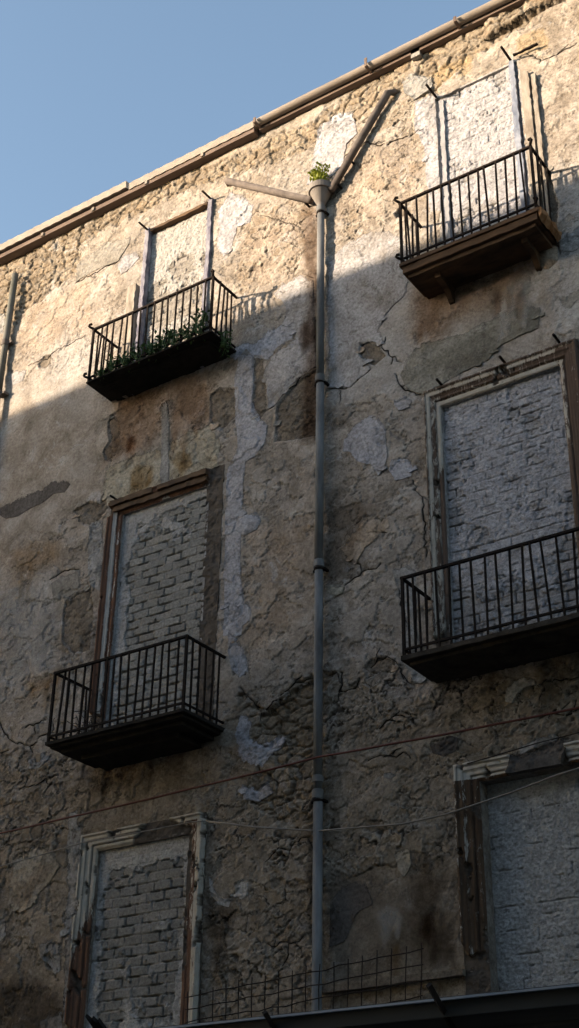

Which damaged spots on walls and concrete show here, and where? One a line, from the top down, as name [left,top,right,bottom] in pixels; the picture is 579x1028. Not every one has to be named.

peeling [306,112,357,185]
peeling [217,192,254,256]
peeling [343,415,418,481]
crack [413,483,428,557]
crack [0,718,57,789]
spalling [234,682,314,768]
crack [240,649,413,721]
crack [368,748,411,761]
crack [379,711,415,729]
peeling [238,781,273,802]